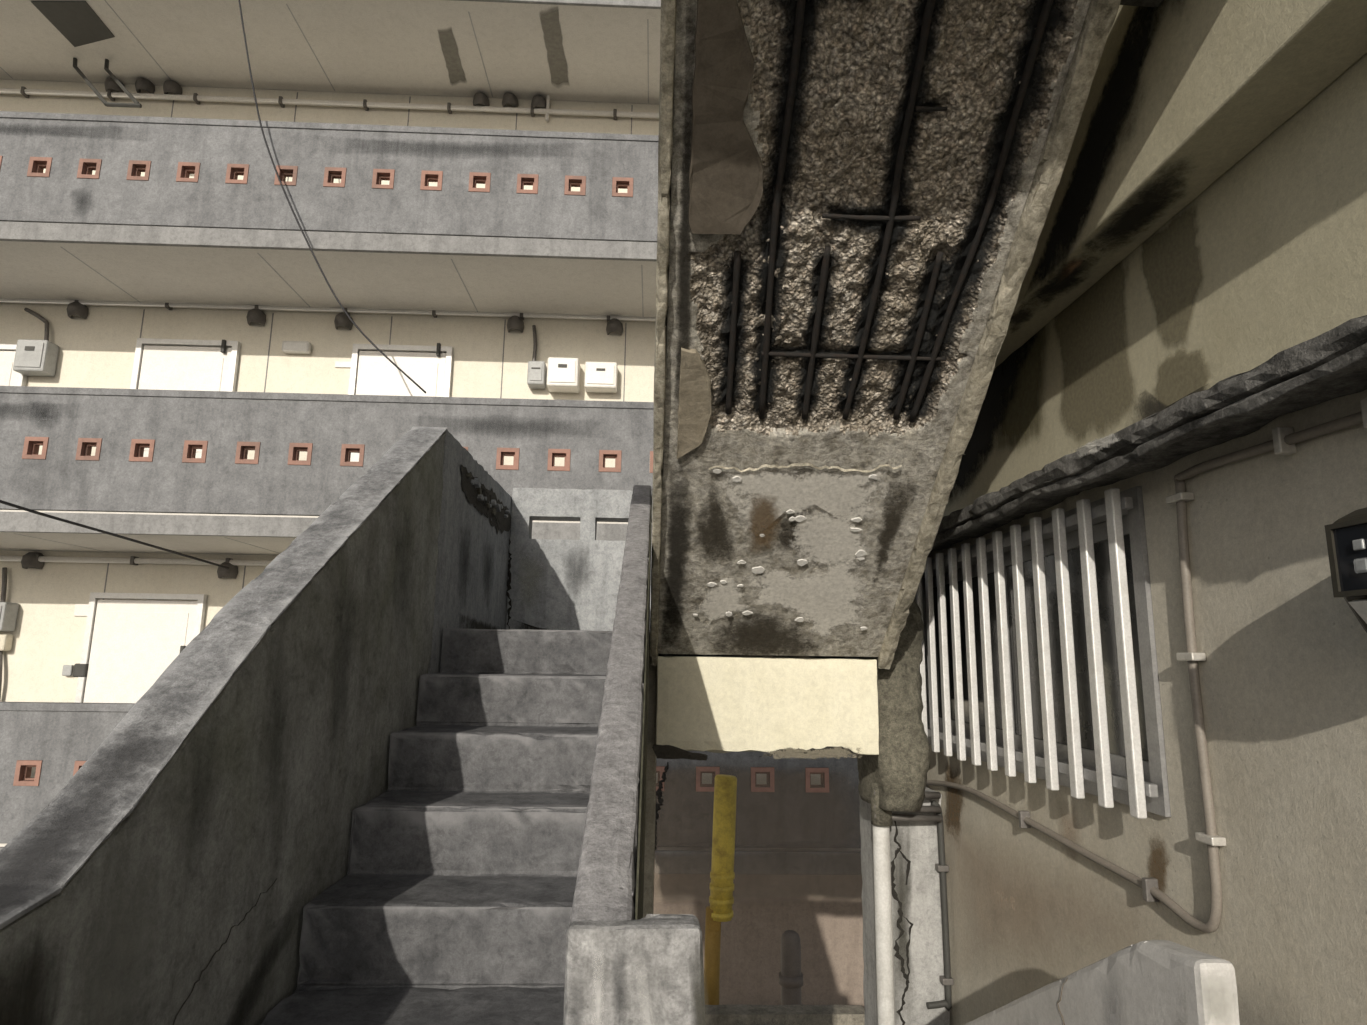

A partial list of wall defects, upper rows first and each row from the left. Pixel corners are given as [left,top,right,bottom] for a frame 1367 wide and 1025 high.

water stain [949,0,1208,499]
spalling [658,0,1091,657]
spalling [1077,433,1120,457]
water stain [662,475,734,645]
water stain [778,511,813,548]
water stain [874,483,915,581]
water stain [713,610,818,658]
crack [655,762,669,850]
crack [891,821,913,1025]